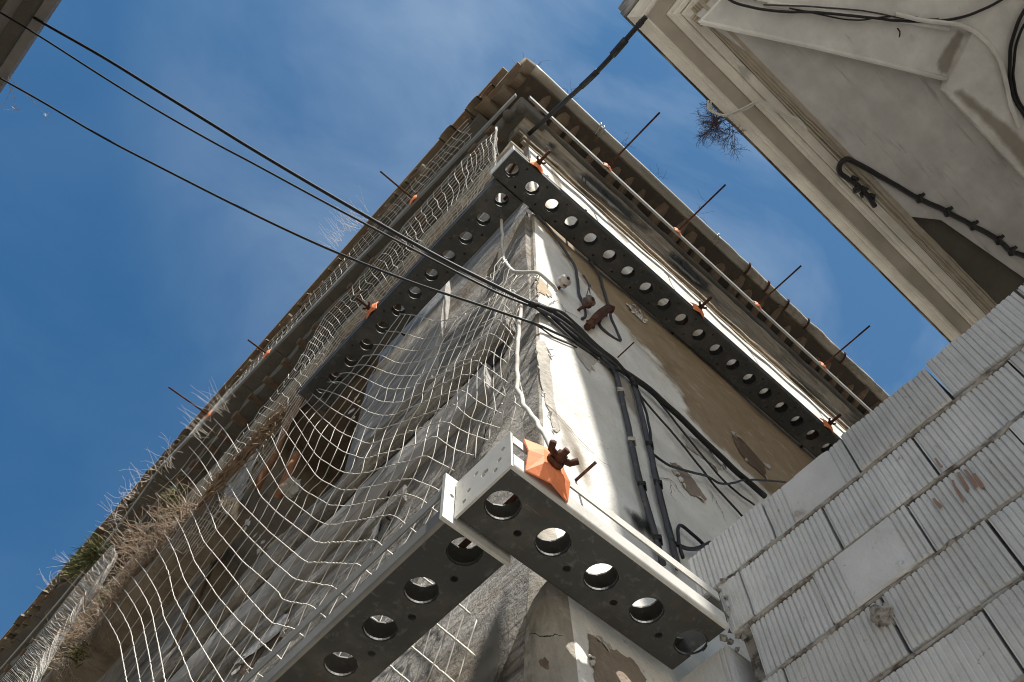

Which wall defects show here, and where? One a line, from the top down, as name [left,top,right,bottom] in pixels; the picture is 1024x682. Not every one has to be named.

spalling [534,274,553,297]
spalling [535,340,560,432]
flaking render [731,431,771,479]
flaking render [670,461,707,503]
flaking render [588,634,647,682]